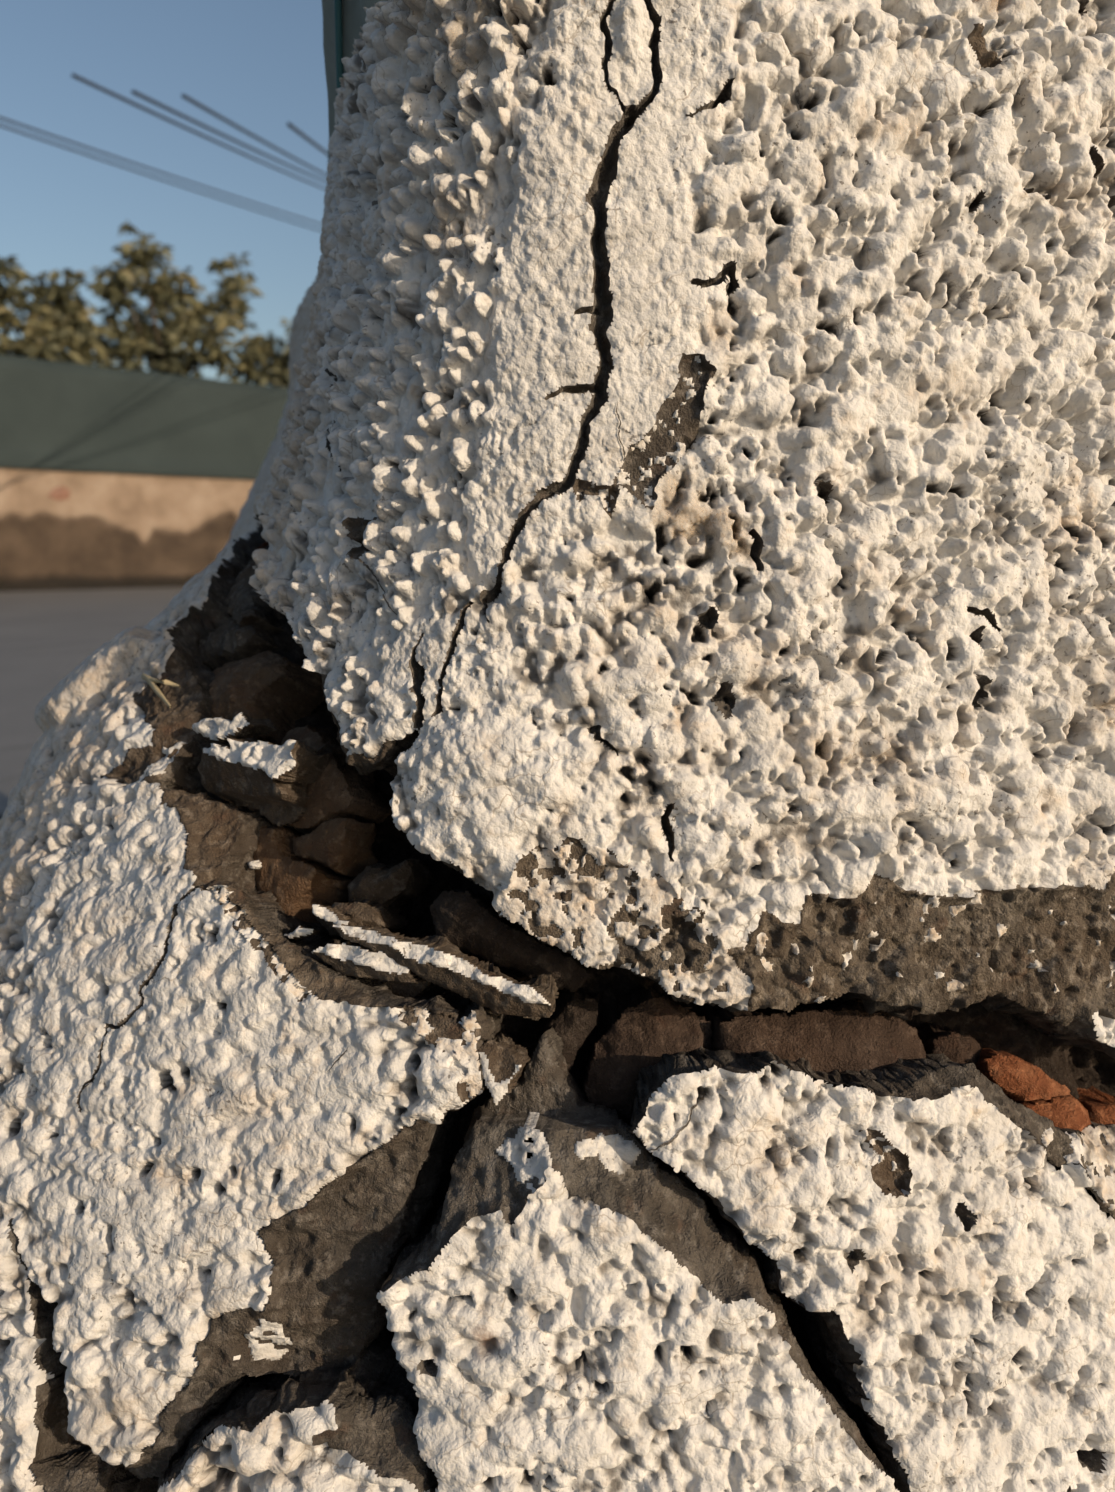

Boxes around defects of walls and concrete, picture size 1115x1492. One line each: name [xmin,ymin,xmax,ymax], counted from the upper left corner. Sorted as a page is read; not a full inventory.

crack [357,0,740,730]
peeling [573,353,717,519]
leakage [0,512,237,592]
crack [748,528,765,572]
crack [967,606,1001,634]
crack [76,882,210,1112]
spalling [26,513,1115,1492]